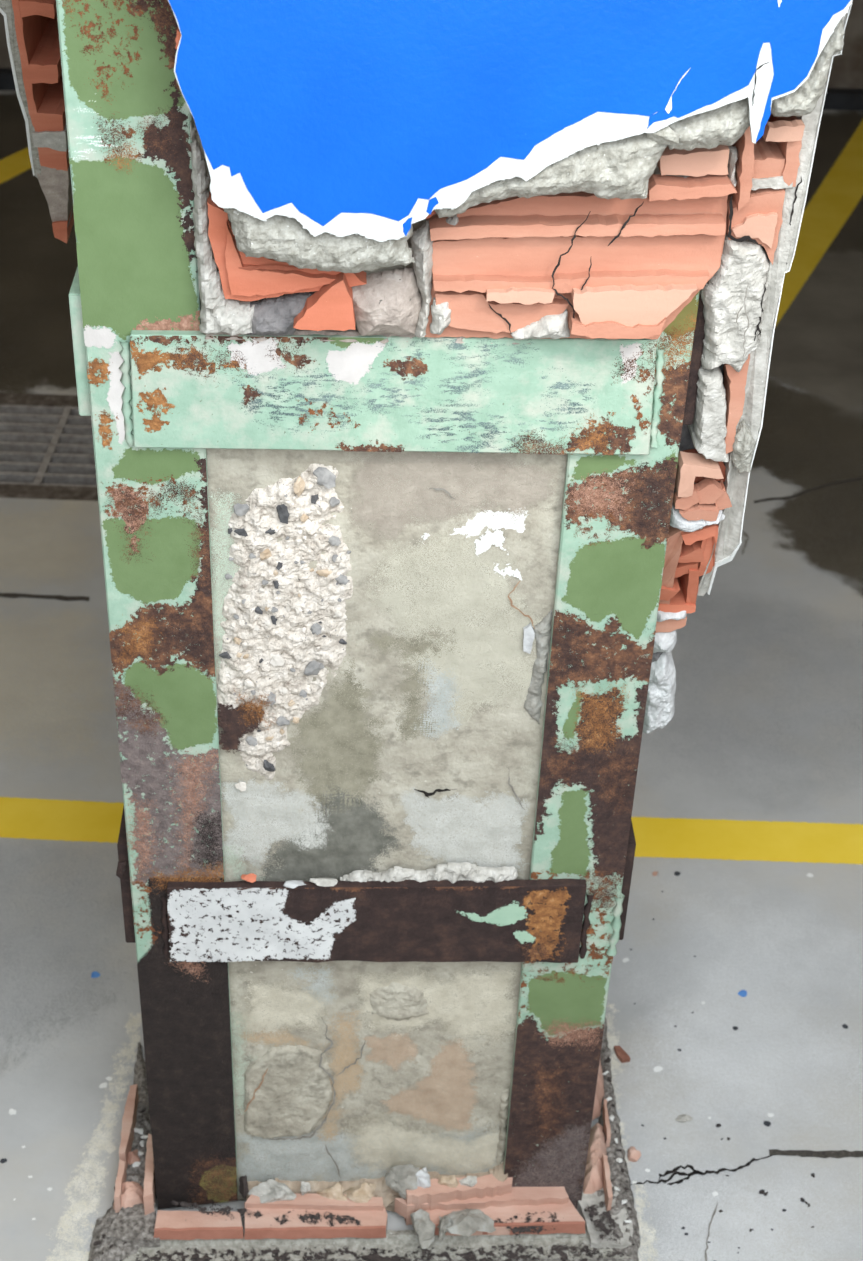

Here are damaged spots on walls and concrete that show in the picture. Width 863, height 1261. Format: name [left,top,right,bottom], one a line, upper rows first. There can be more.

corrosion [58,0,198,277]
corrosion [130,310,331,433]
spalling [217,464,353,792]
peeling [450,508,530,580]
crack [489,304,511,333]
flaking render [210,8,849,273]
crack [552,201,644,318]
corrosion [505,310,696,549]
leakage [751,196,863,598]
leakage [804,110,863,211]
corrosion [101,458,311,1209]
corrosion [427,609,656,1210]